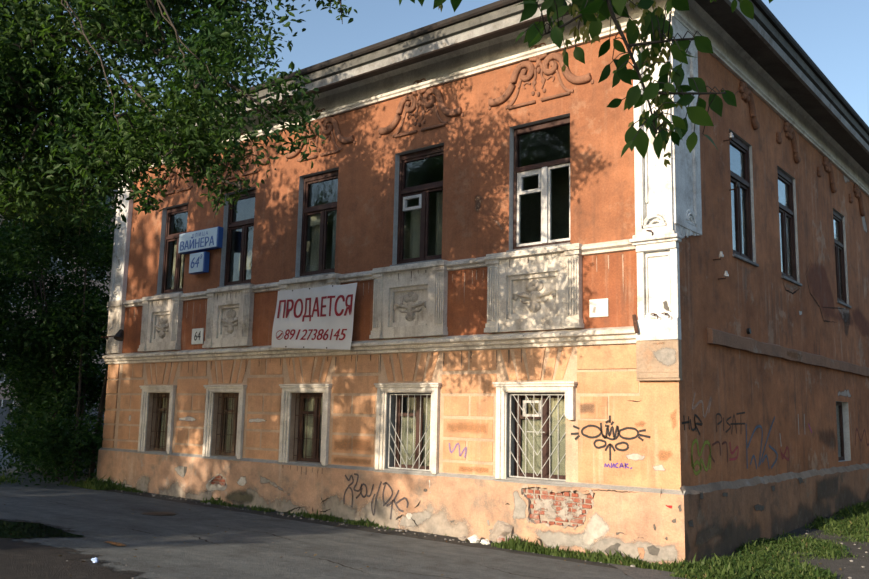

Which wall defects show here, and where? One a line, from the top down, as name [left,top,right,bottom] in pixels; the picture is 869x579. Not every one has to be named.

flaking render [159,467,307,515]
flaking render [521,486,678,562]